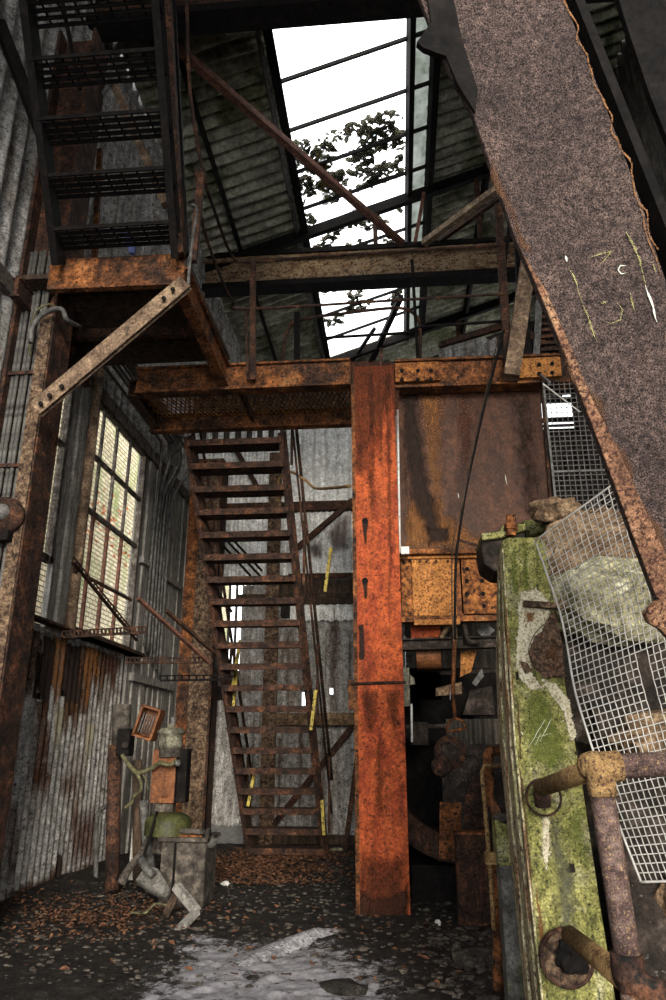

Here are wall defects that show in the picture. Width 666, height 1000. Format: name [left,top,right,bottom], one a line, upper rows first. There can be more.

rust [403,394,479,547]
damp [512,543,538,593]
rust [51,635,67,703]
rust [78,645,121,714]
rust [6,853,62,897]
damp [541,816,574,927]